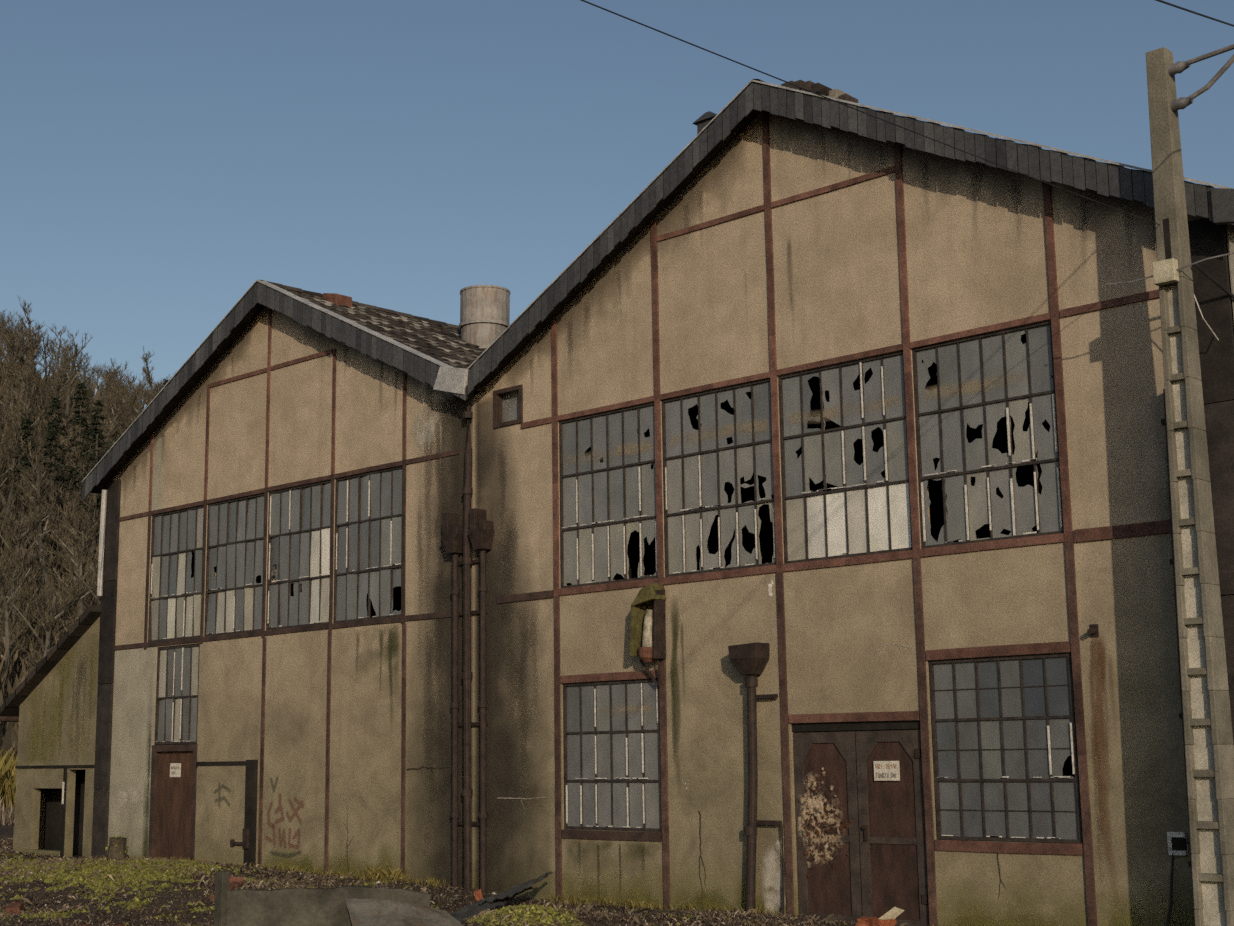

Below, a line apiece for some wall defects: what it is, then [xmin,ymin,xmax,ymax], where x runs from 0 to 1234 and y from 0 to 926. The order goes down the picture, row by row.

damp [380,632,398,680]
damp [428,396,530,893]
rust [1091,641,1104,758]
peeling [763,841,785,915]
peeling [798,768,852,878]